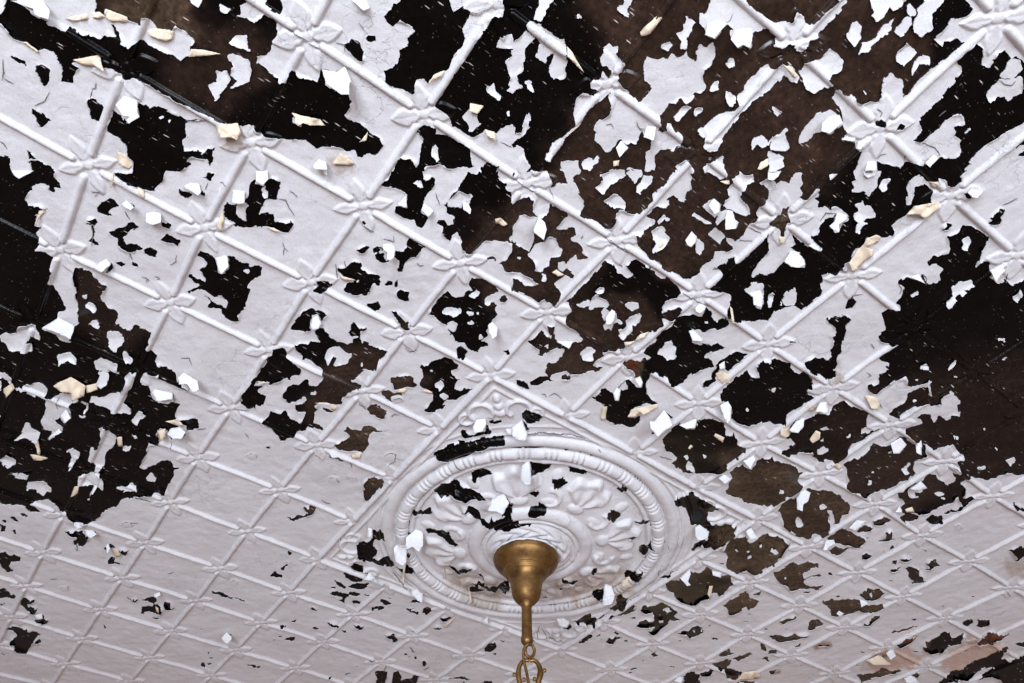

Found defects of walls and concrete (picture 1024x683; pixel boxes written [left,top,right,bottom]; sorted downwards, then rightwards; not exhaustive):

peeling [0,0,387,546]
peeling [313,238,425,330]
peeling [330,0,1024,683]
peeling [0,552,21,572]
peeling [0,588,48,654]
peeling [132,592,174,619]